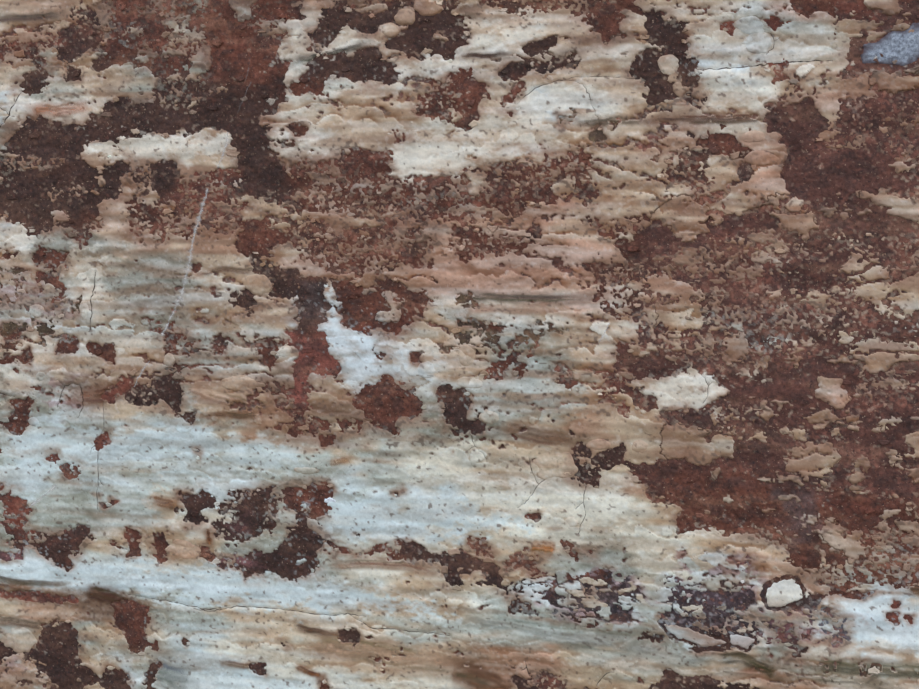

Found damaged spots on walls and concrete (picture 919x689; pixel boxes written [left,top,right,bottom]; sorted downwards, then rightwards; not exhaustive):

corrosion [0,0,614,447]
corrosion [479,0,919,666]
corrosion [110,527,169,564]
corrosion [156,481,641,628]
corrosion [0,584,162,689]
corrosion [453,664,566,689]
corrosion [649,668,759,689]